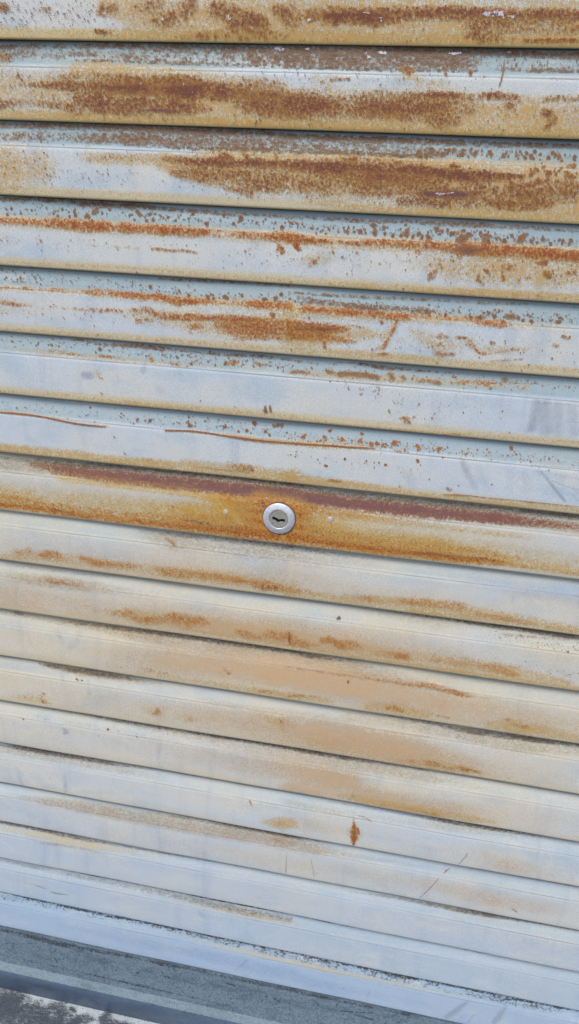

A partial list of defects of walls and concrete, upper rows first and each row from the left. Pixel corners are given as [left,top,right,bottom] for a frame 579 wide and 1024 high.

rust [0,0,579,473]
rust [0,444,579,574]
rust [350,819,360,845]